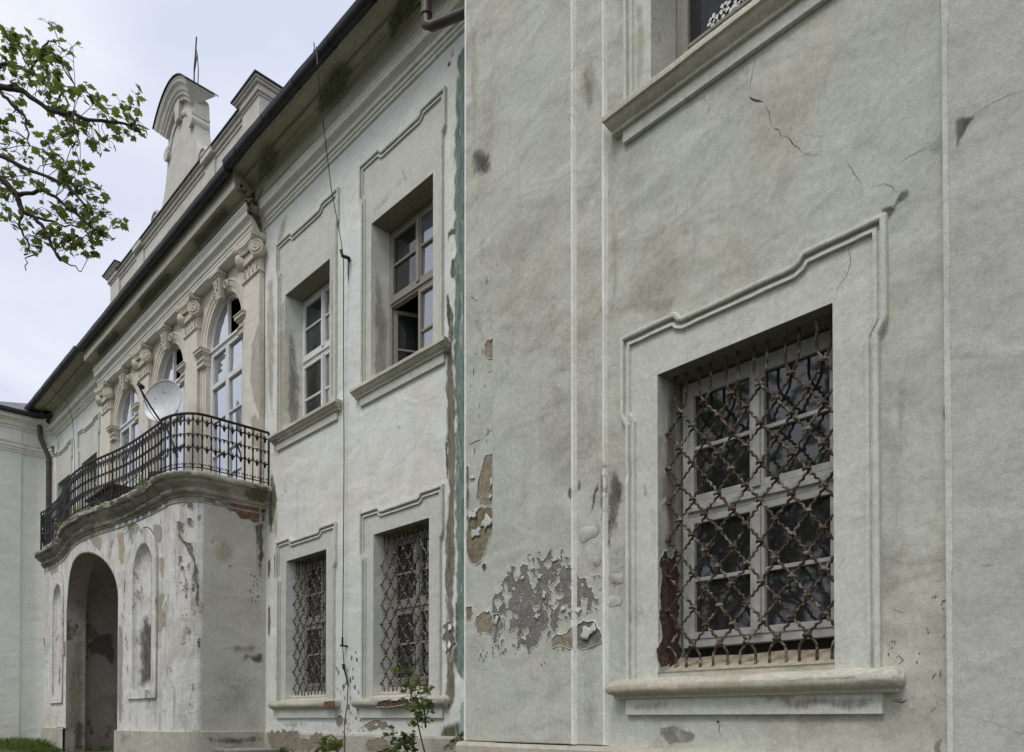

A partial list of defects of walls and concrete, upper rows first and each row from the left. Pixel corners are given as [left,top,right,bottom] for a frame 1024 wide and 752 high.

crack [750,58,821,155]
damp [439,47,489,736]
damp [59,625,123,751]
damp [140,593,167,685]
peeling [177,502,200,614]
flaking render [220,501,260,523]
peeling [267,728,327,752]
peeling [324,651,442,752]
spalling [466,428,493,571]
peeling [442,548,604,662]
damp [592,466,623,544]
peeling [660,725,694,743]